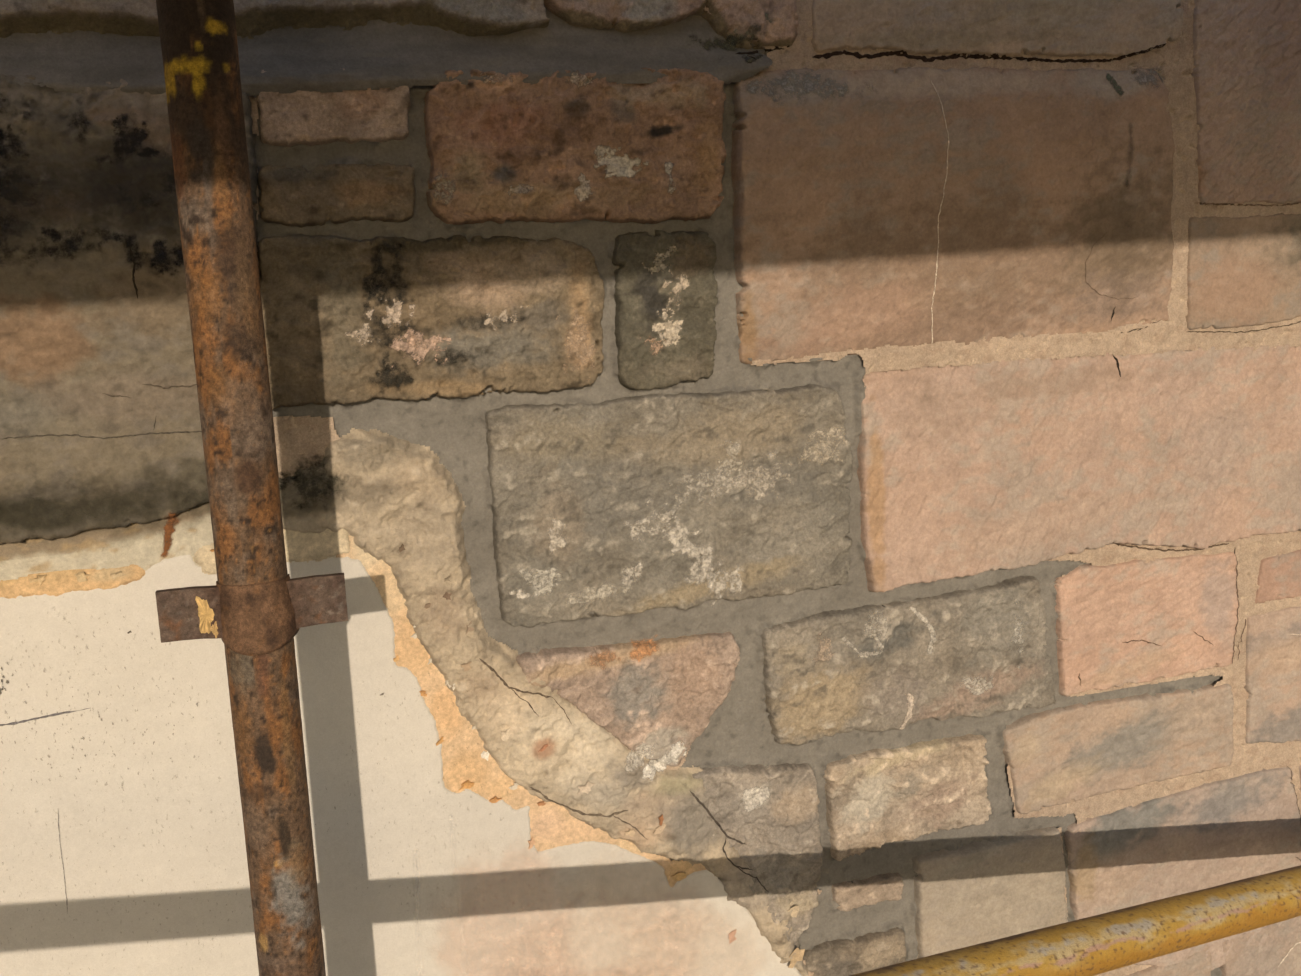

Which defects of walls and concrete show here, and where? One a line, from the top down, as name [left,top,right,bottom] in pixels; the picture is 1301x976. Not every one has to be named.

peeling [0,564,145,599]
rust [161,513,179,557]
peeling [193,543,217,575]
crack [479,658,571,723]
spalling [279,428,808,976]
crack [690,791,769,892]